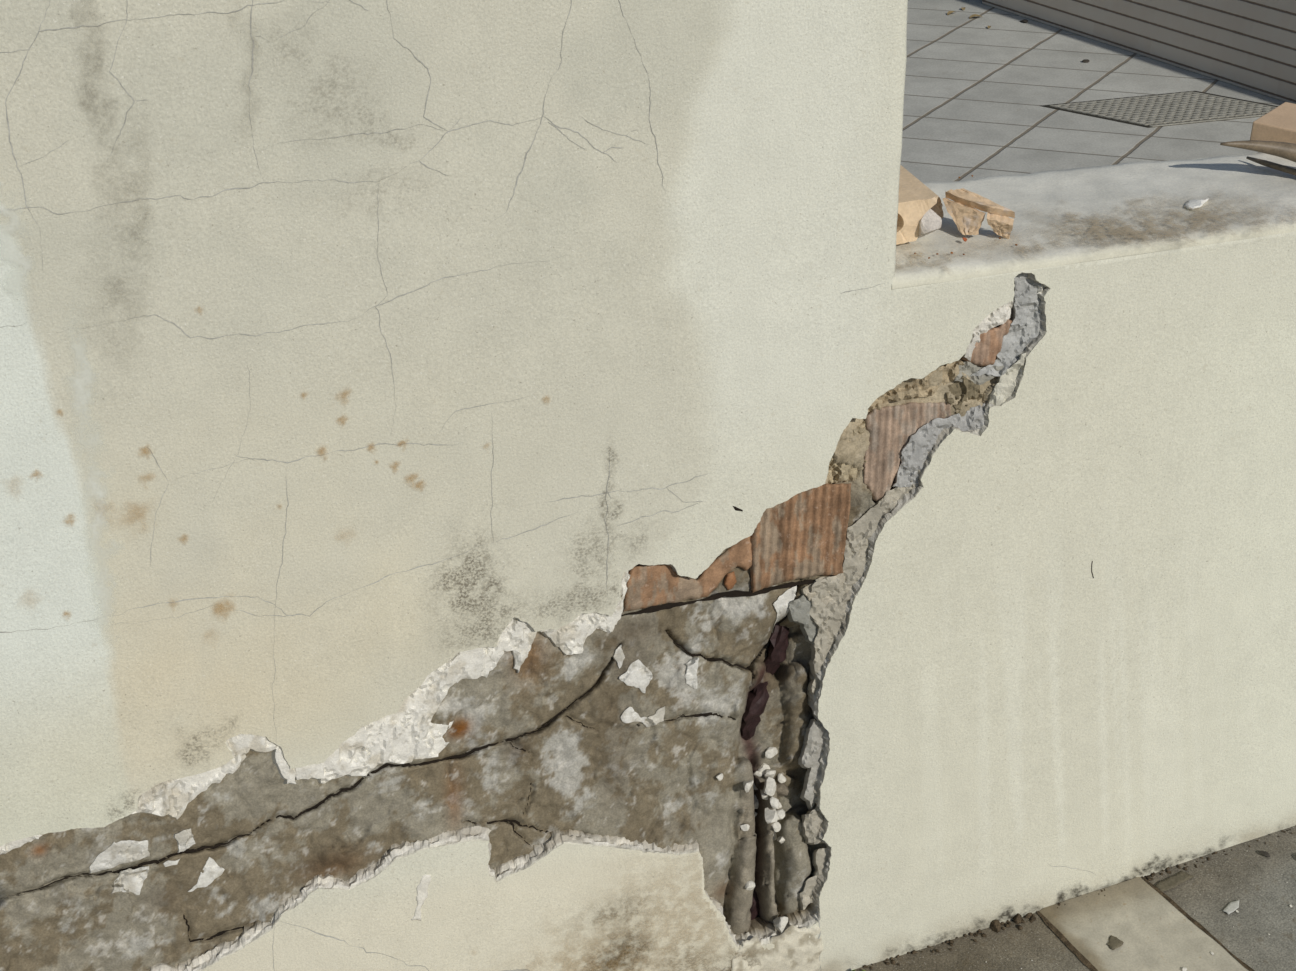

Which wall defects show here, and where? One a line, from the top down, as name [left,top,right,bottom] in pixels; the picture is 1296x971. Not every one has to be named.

crack [183,915,429,971]
spalling [0,272,1050,971]